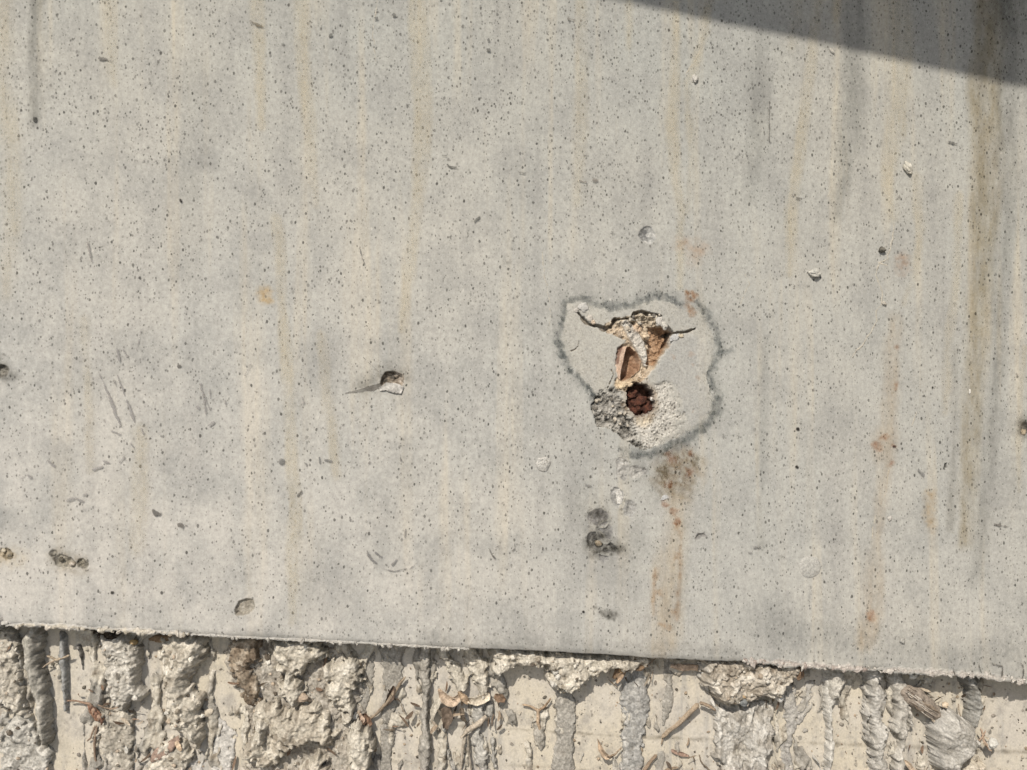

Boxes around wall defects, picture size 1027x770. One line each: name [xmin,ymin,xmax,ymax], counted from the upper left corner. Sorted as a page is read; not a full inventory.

spalling [557,296,717,567]
peeling [232,595,258,619]
spalling [0,621,469,651]
spalling [742,657,1027,686]